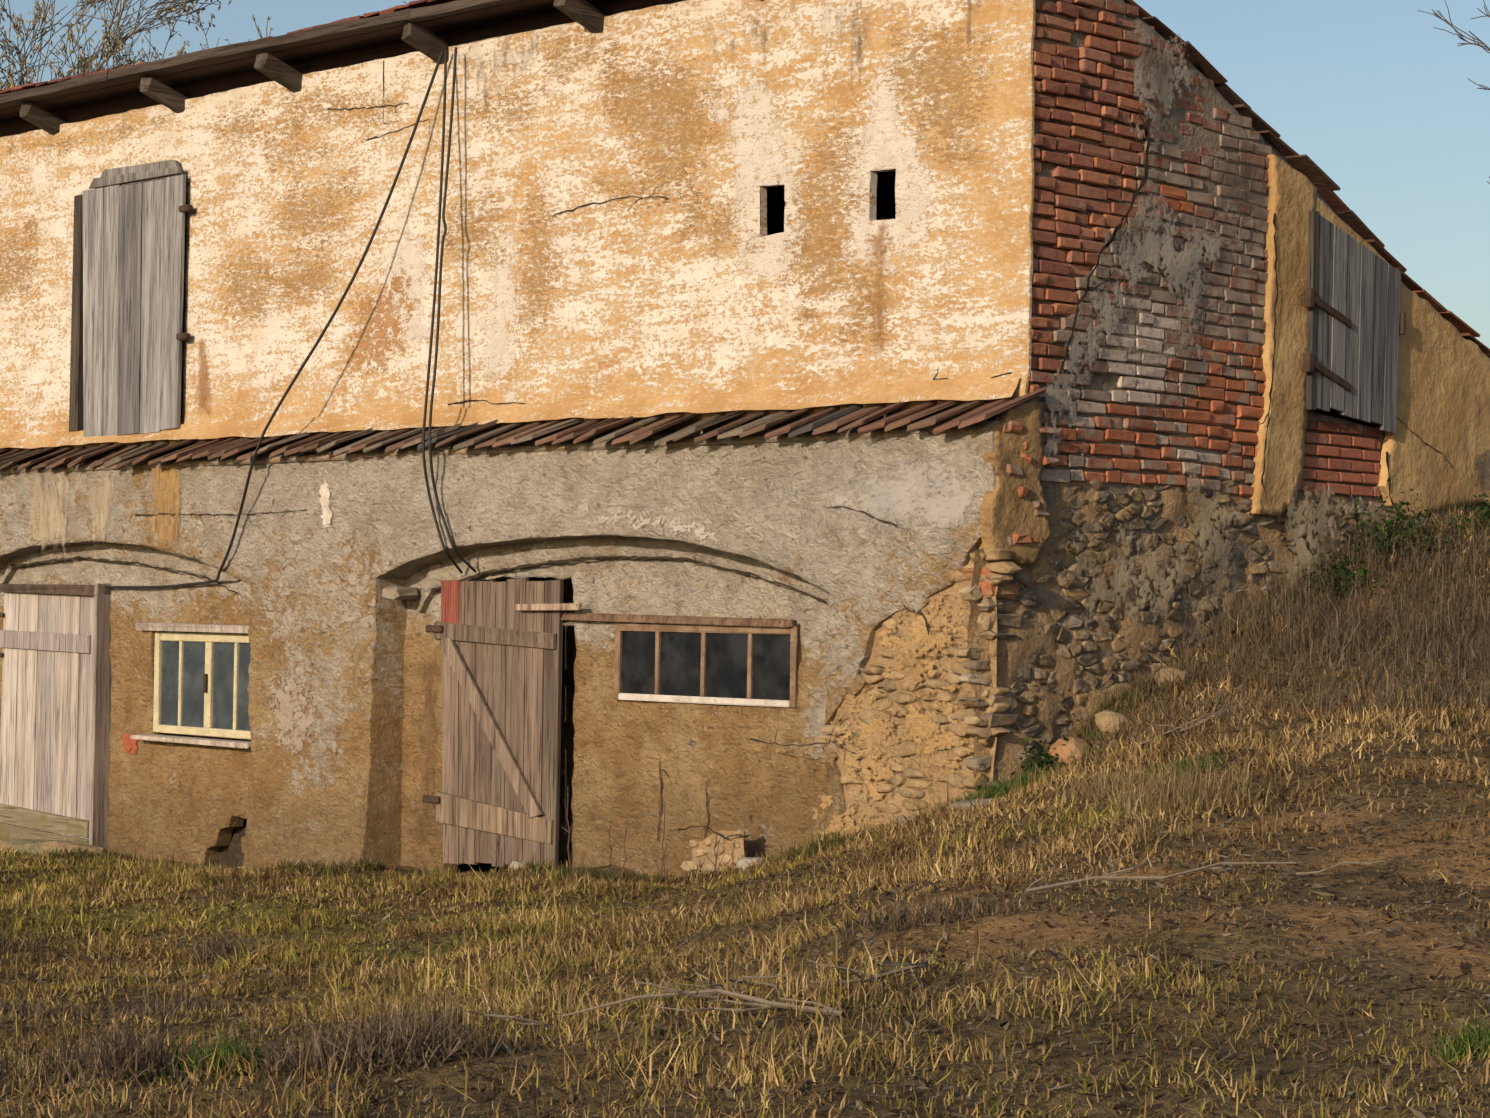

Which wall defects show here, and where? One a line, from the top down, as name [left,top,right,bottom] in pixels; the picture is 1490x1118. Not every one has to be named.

peeling [0,217,39,308]
peeling [7,114,165,158]
peeling [214,89,562,405]
peeling [463,22,992,356]
crack [1059,108,1153,374]
flaking render [1027,0,1276,510]
peeling [830,458,979,536]
spalling [813,544,1022,844]
spalling [218,827,246,869]